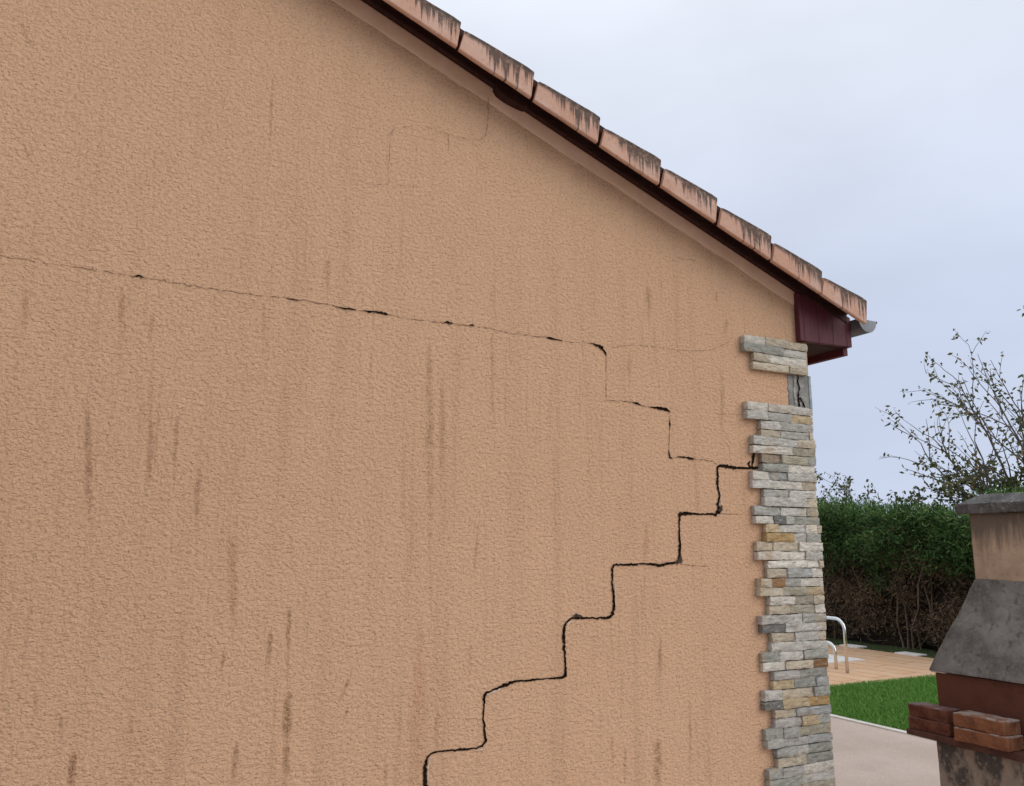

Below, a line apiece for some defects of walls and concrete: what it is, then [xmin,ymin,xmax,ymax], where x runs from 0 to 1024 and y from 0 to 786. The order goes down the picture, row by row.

crack [0,255,758,786]